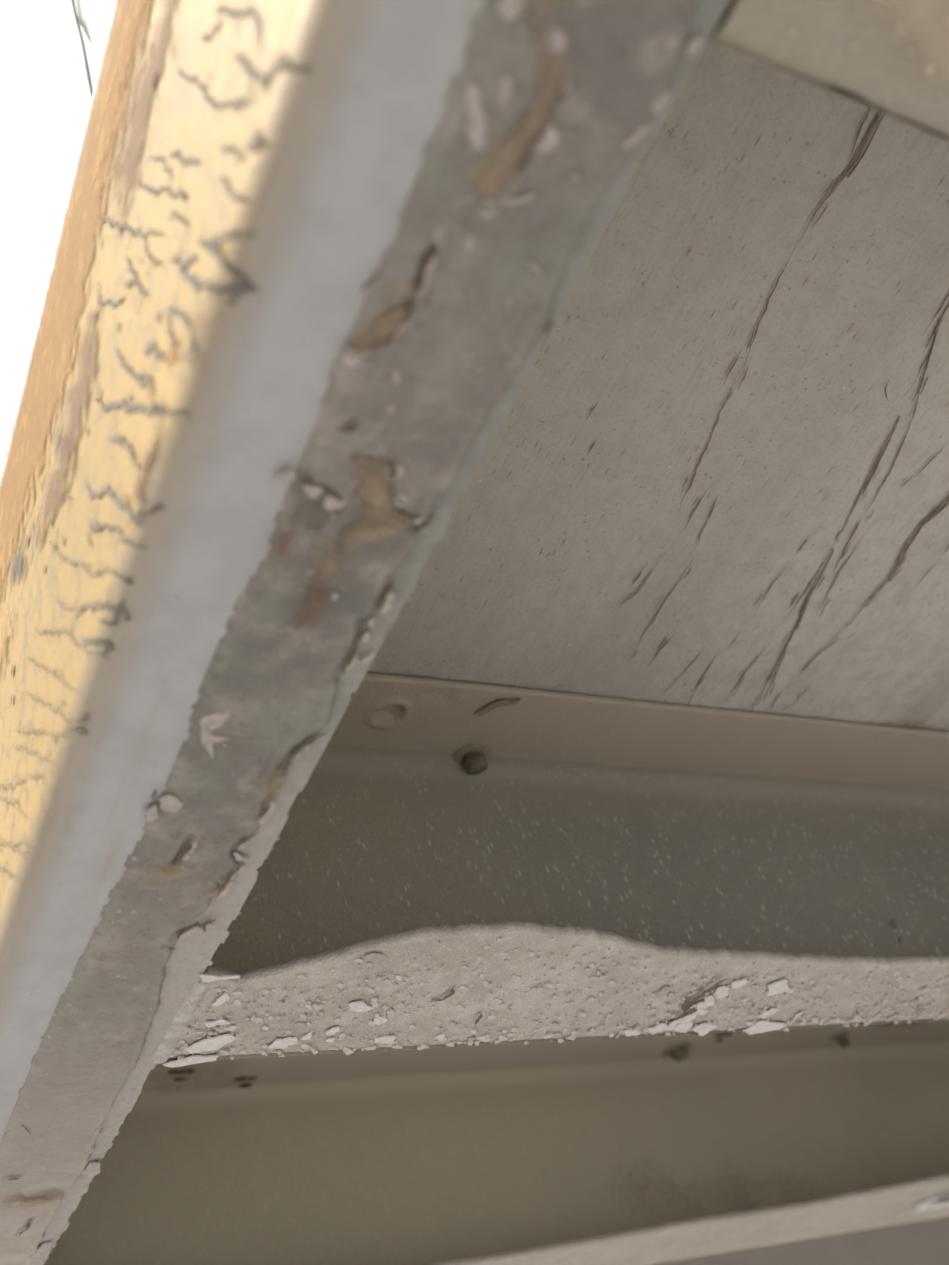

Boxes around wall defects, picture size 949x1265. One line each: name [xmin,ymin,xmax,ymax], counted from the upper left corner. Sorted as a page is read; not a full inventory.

peeling [496,0,524,22]
peeling [453,29,569,218]
peeling [341,226,445,382]
crack [620,108,949,713]
peeling [275,469,359,511]
peeling [346,445,434,538]
peeling [475,697,521,716]
peeling [200,711,245,758]
peeling [145,794,183,827]
peeling [217,851,249,901]
peeling [163,936,949,1068]
peeling [83,1162,100,1177]